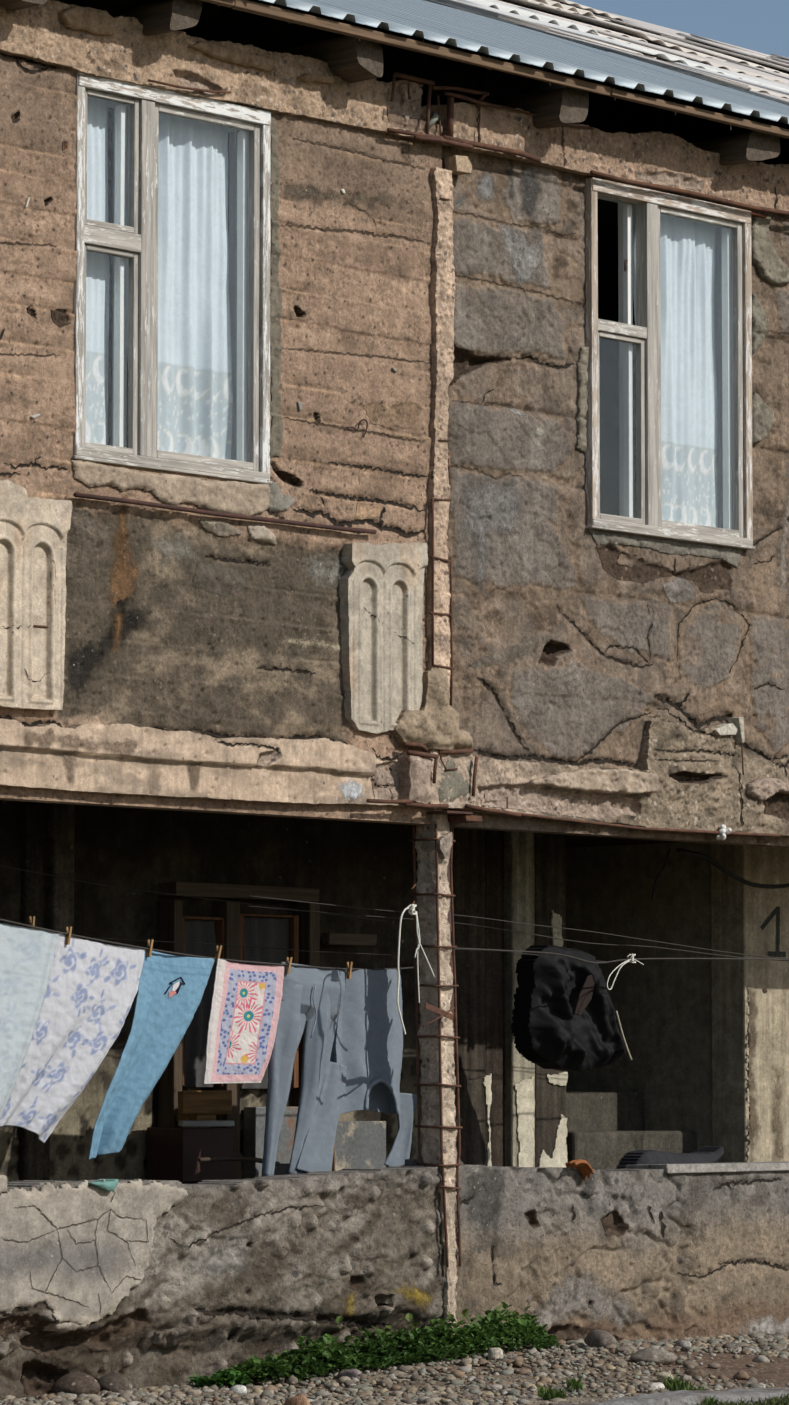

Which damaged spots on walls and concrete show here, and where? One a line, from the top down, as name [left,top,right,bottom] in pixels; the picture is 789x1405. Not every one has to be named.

crack [0,456,68,476]
rust [110,497,138,651]
leakage [311,559,344,584]
spalling [588,529,741,593]
leakage [68,610,150,692]
leakage [287,639,342,652]
spalling [538,639,572,666]
crack [473,598,789,826]
spalling [366,745,789,1267]
crack [1,1191,327,1315]
crack [648,1206,667,1238]
crack [678,1258,789,1278]